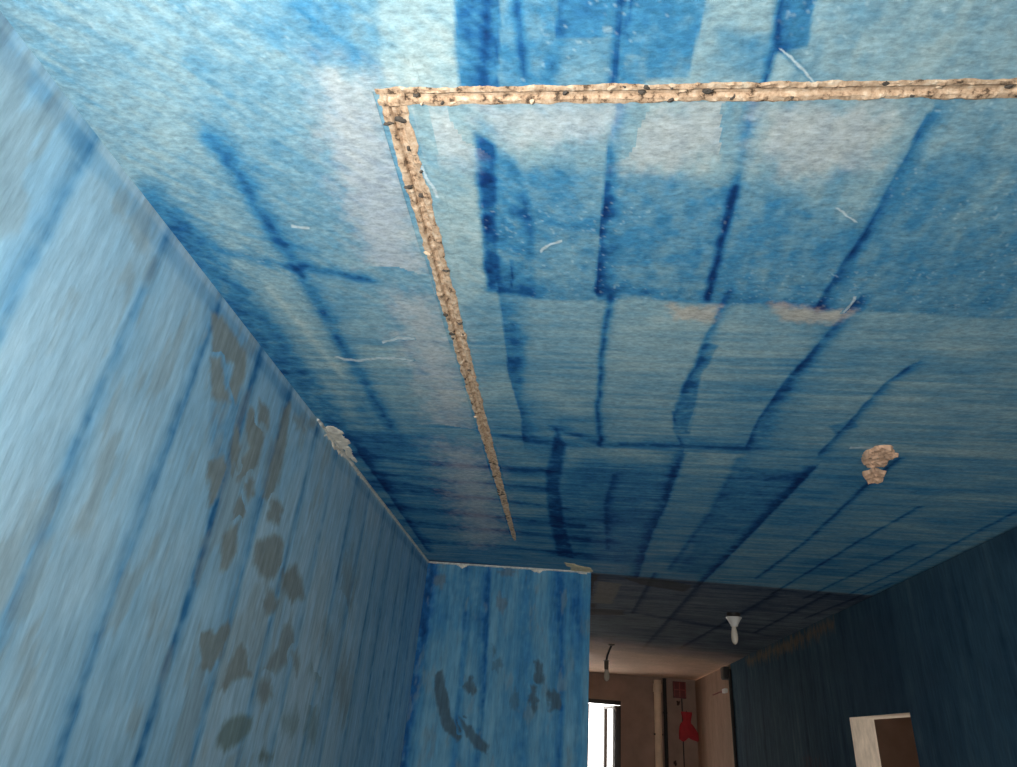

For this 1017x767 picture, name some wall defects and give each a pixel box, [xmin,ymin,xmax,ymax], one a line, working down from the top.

flaking render [324,426,362,479]
spalling [861,445,899,485]
flaking render [196,306,308,767]